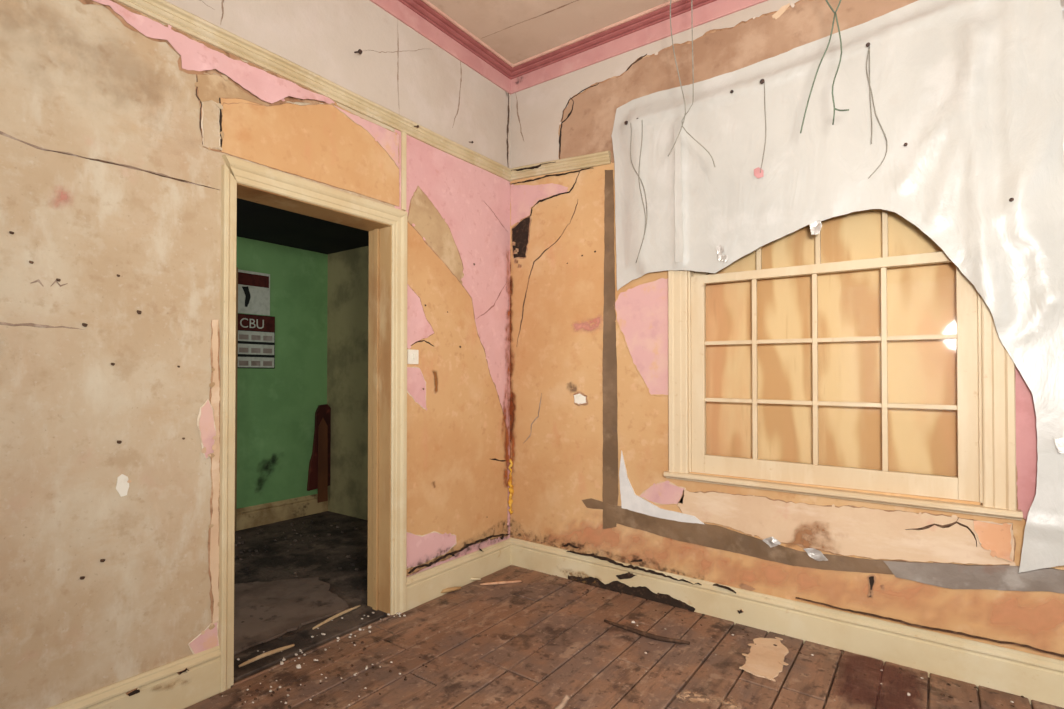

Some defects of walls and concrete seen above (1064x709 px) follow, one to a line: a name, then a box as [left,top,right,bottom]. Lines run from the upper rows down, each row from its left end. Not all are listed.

crack [0,131,219,190]
peeling [79,0,337,152]
crack [196,80,223,148]
crack [483,0,579,38]
crack [478,83,599,342]
flaking render [558,0,918,163]
rust [503,265,515,486]
peeling [615,276,668,397]
flaking render [639,365,1038,566]
peeling [407,531,456,569]
leakage [535,525,817,593]
crack [905,518,977,547]